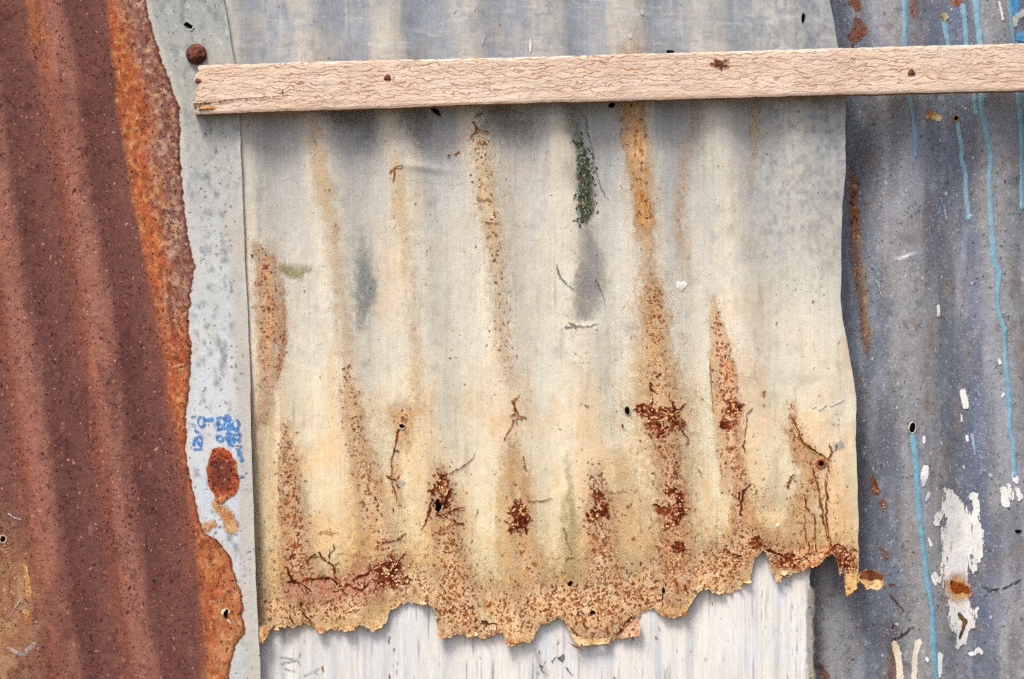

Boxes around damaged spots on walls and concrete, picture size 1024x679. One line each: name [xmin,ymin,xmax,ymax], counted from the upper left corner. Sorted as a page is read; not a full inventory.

rust [0,0,245,679]
rust [251,244,287,418]
rust [257,101,886,646]
rust [946,575,970,639]